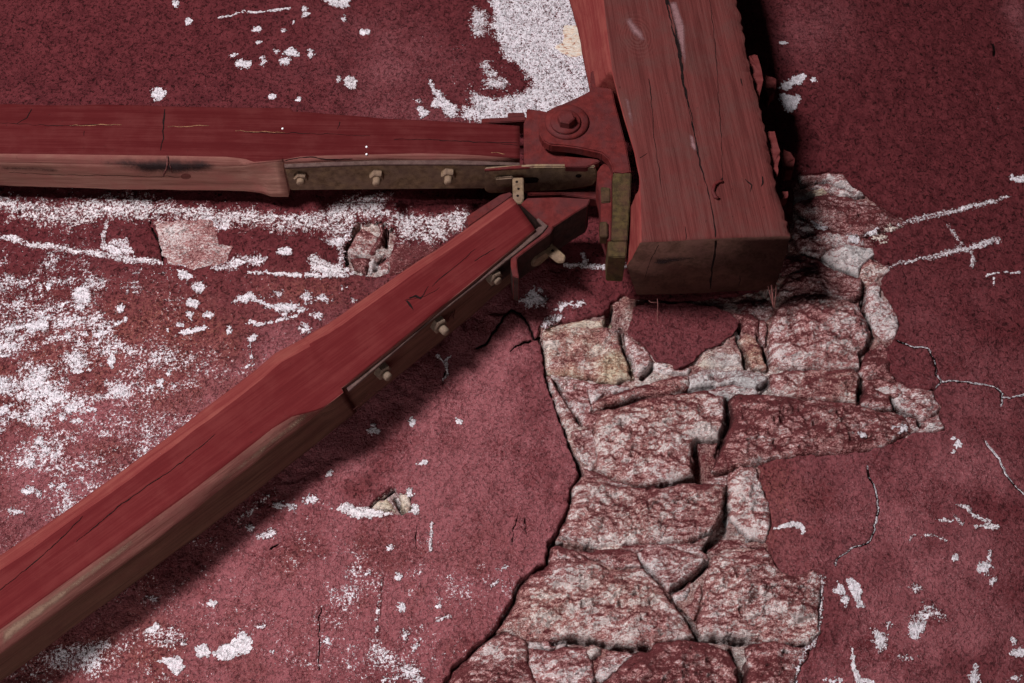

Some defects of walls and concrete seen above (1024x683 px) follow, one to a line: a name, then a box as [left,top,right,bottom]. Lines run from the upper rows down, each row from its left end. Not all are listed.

peeling [0,188,471,369]
crack [476,309,541,352]
peeling [0,376,15,416]
flaking render [448,173,1012,683]
crack [897,340,1024,406]
peeling [331,487,420,520]
crack [835,465,879,566]
peeling [434,601,451,622]